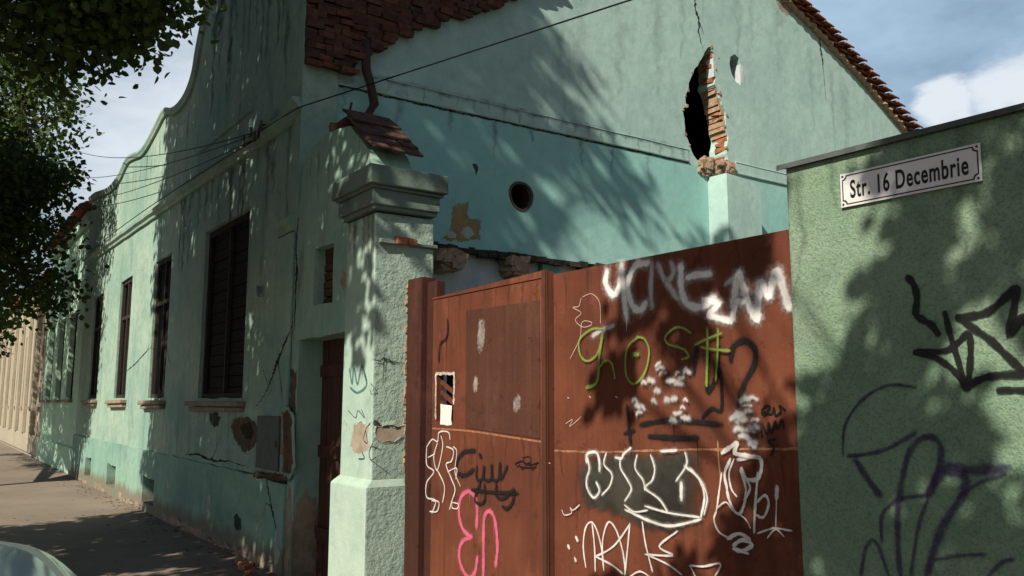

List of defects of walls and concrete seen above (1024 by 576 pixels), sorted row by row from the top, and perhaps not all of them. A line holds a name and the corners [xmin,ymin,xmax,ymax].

crack [694,0,704,51]
spalling [730,65,744,83]
peeling [442,202,481,242]
crack [256,218,299,406]
spalling [209,412,257,456]
spalling [253,369,296,482]
spalling [350,284,408,477]
crack [186,447,279,563]